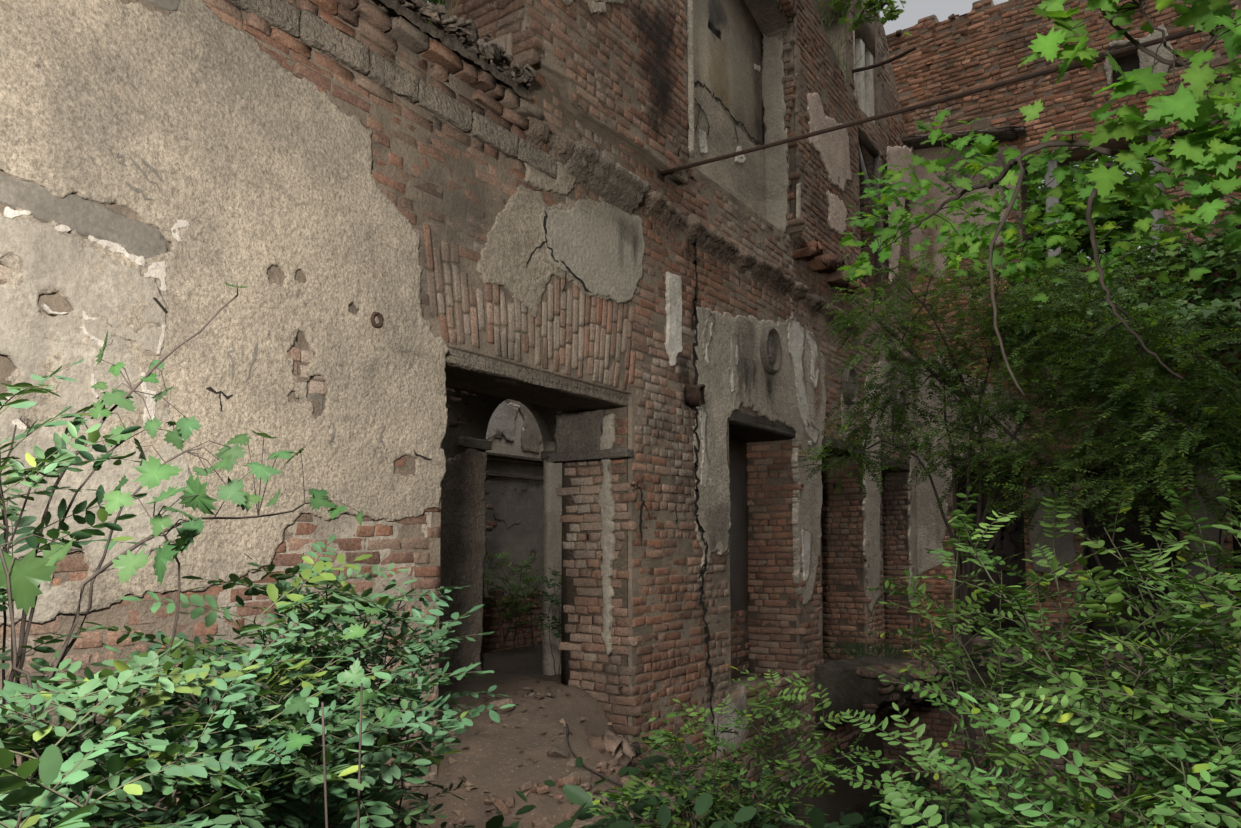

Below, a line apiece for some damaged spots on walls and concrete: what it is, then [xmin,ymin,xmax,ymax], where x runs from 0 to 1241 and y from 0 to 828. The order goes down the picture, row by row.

peeling [0,174,190,292]
crack [526,210,591,294]
peeling [729,332,742,408]
peeling [788,315,820,446]
crack [630,238,716,737]
peeling [699,406,711,488]
peeling [801,529,813,582]
flaking render [214,512,439,740]